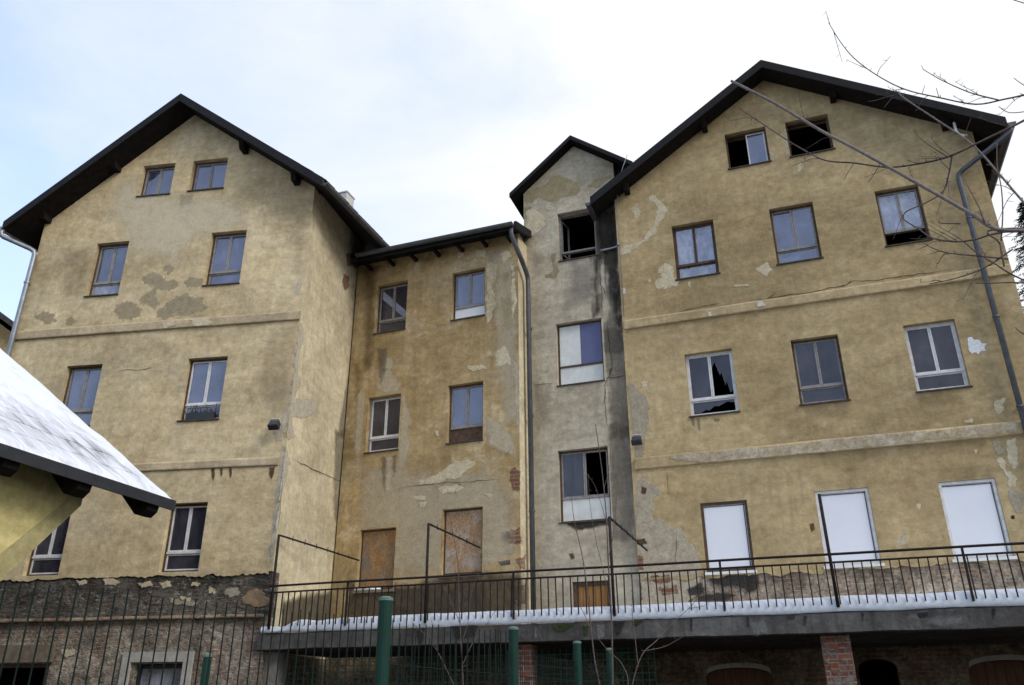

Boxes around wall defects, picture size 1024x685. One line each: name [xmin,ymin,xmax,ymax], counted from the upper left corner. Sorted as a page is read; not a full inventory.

peeling [524,175,612,236]
flaking render [619,195,668,255]
flaking render [34,311,77,326]
flaking render [114,189,237,328]
flaking render [457,248,517,323]
water stain [593,251,620,317]
flaking render [648,263,691,289]
flaking render [755,262,772,276]
crack [756,269,949,300]
flaking render [355,391,365,461]
flaking render [366,346,526,570]
flaking render [628,380,1024,605]